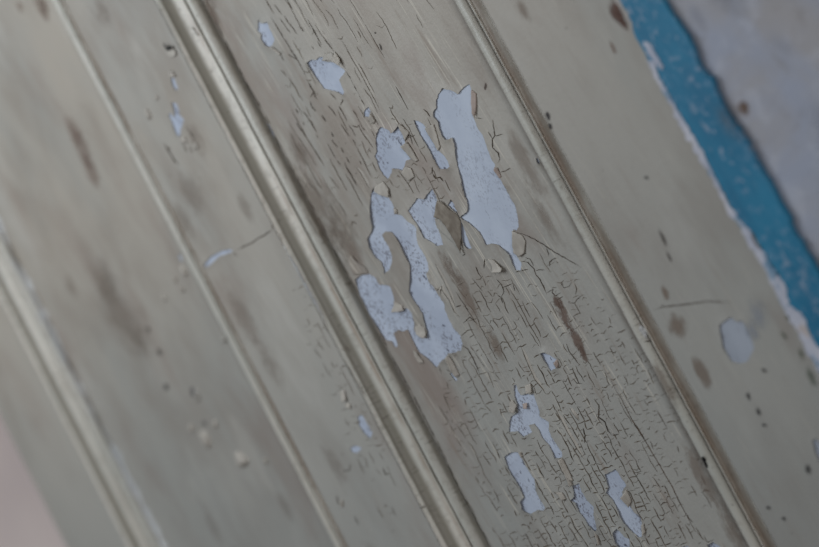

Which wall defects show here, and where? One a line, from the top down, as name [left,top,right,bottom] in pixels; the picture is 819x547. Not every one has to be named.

peeling [308,52,345,95]
crack [205,0,450,304]
peeling [349,84,526,381]
crack [473,117,510,172]
peeling [615,0,633,30]
peeling [643,42,819,372]
peeling [505,383,600,545]
peeling [605,469,645,547]